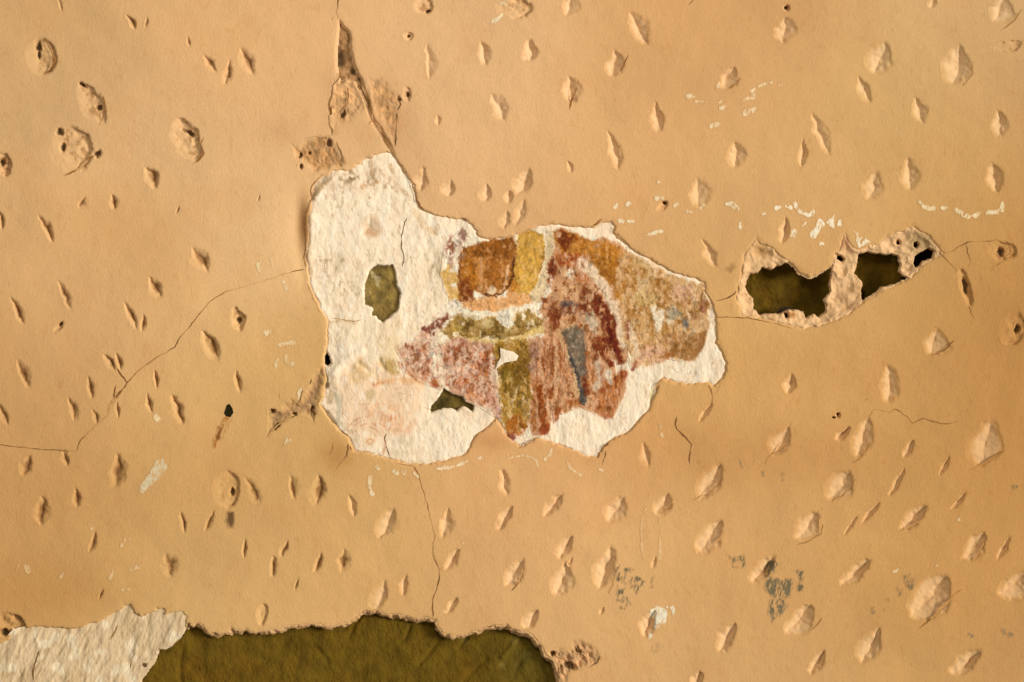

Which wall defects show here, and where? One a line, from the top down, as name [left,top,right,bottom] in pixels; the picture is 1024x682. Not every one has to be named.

crack [328,0,469,222]
crack [0,176,322,451]
flaking render [261,76,727,497]
flaking render [736,201,943,329]
flaking render [0,605,603,682]
crack [398,463,442,617]